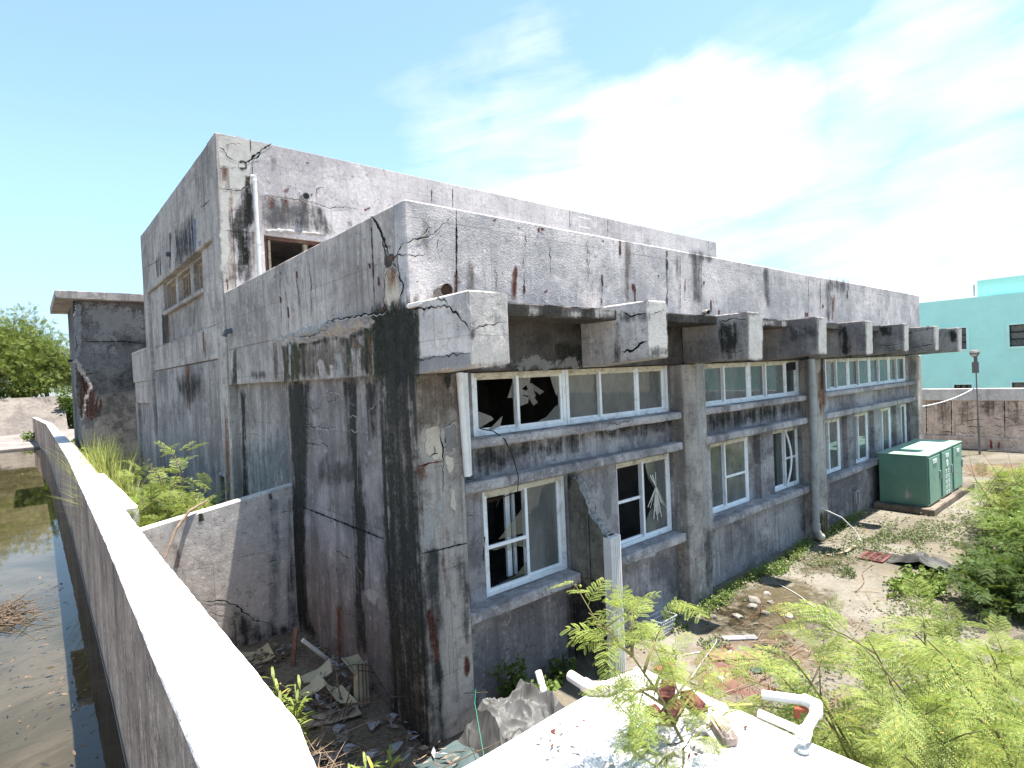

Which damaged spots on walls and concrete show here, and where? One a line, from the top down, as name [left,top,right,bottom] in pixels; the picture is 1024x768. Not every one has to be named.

leakage [156,218,194,278]
leakage [230,176,329,279]
crack [201,143,500,361]
peeling [384,246,400,306]
leakage [699,268,769,360]
crack [622,340,649,354]
peeling [425,426,454,474]
leakage [478,434,583,473]
leakage [232,298,456,747]
peeling [602,471,611,519]
crack [198,599,273,626]